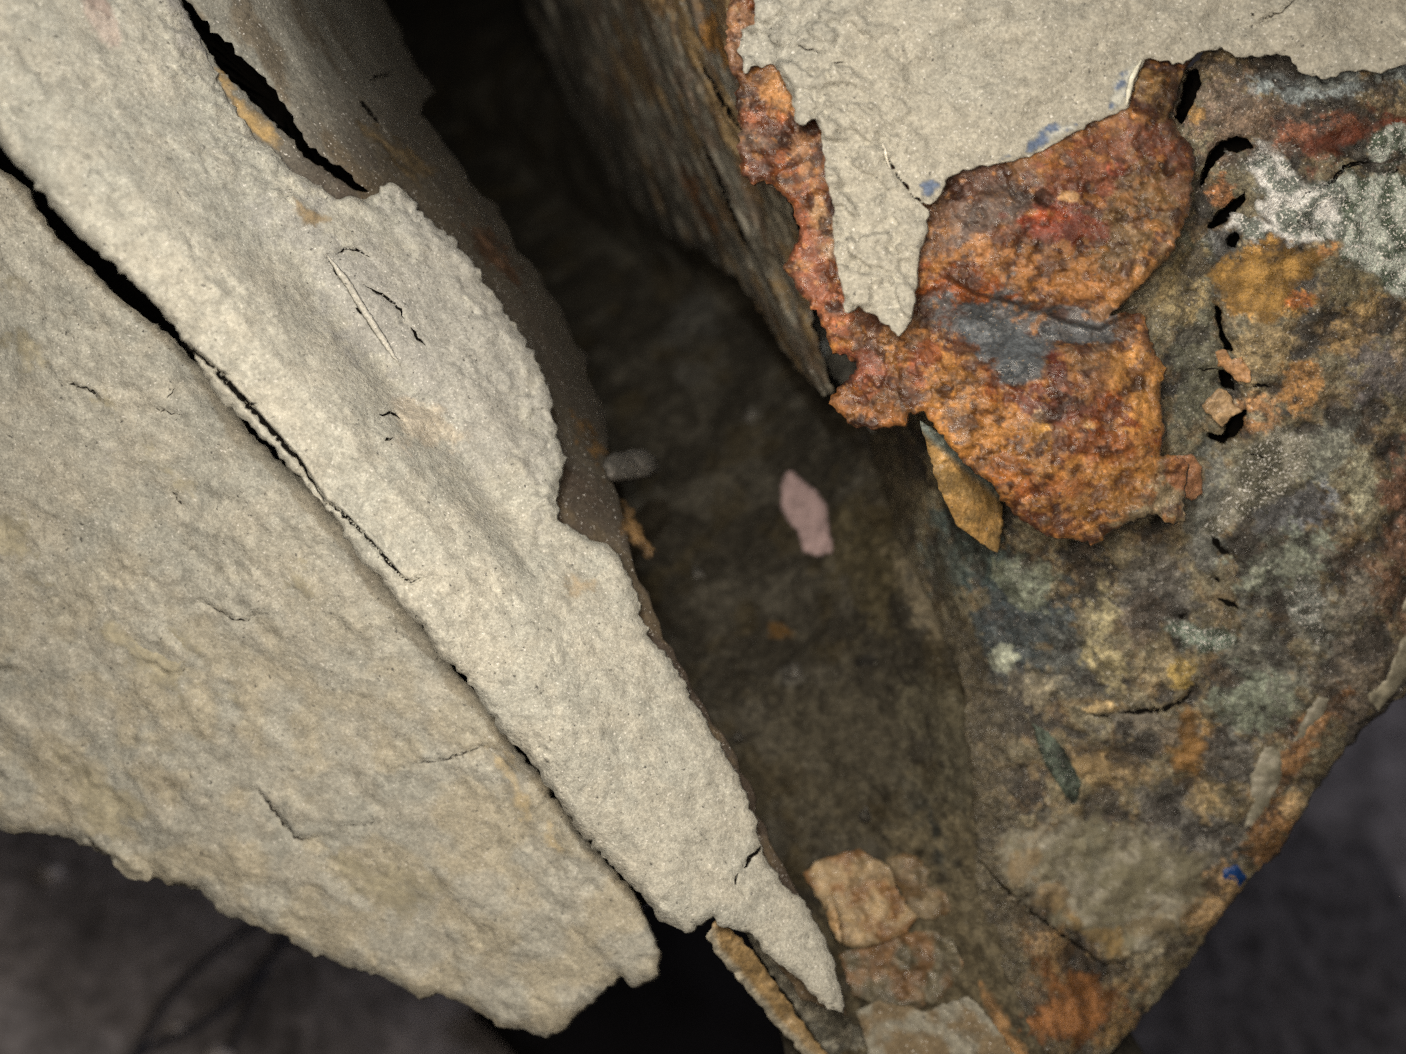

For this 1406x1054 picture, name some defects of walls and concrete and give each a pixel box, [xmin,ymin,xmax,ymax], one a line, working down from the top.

crack [181,0,368,192]
peeling [920,180,940,196]
peeling [1025,123,1077,153]
peeling [1107,59,1142,113]
peeling [325,253,400,365]
corrosion [693,0,1196,553]
crack [0,146,426,583]
corrosion [1201,427,1312,537]
crack [420,745,557,799]
crack [589,840,647,905]
corrosion [803,849,964,1010]
corrosion [979,958,1121,1054]